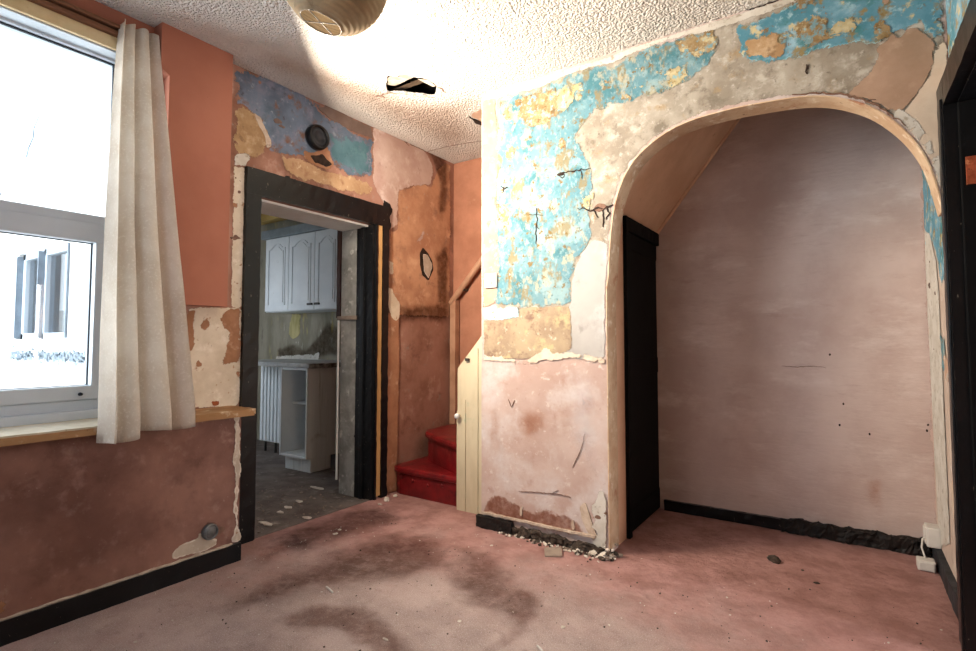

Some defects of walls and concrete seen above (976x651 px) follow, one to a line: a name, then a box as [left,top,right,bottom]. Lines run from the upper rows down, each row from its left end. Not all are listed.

spalling [386,76,437,95]
peeling [234,69,374,195]
crack [557,168,591,178]
peeling [469,0,970,320]
crack [577,203,613,226]
peeling [187,153,250,542]
flaking render [484,348,605,364]
peeling [893,109,950,546]
leakage [487,496,597,541]
flaking render [591,491,607,550]